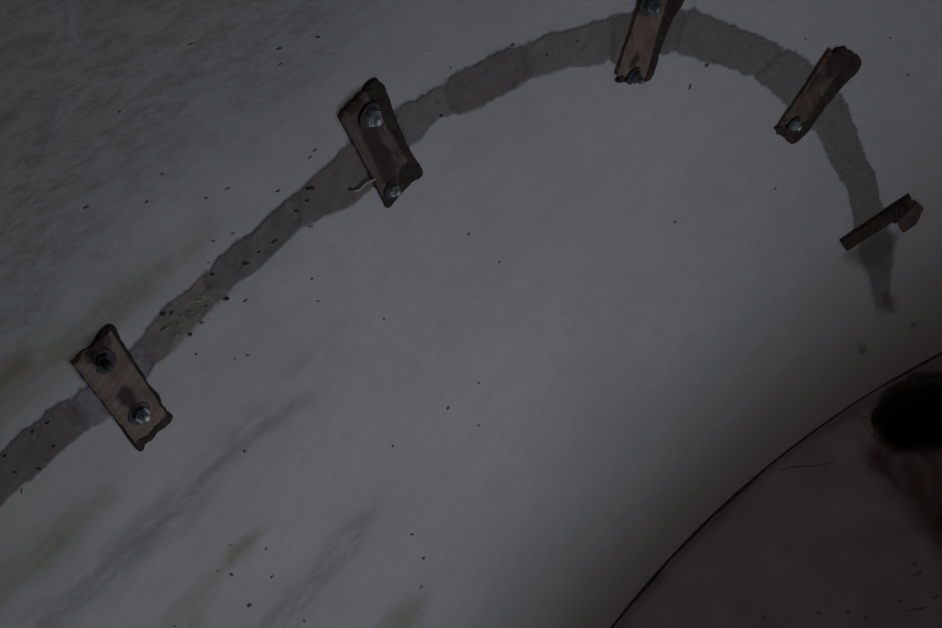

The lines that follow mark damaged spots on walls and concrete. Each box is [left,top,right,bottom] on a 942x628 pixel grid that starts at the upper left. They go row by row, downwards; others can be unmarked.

spalling [856,373,942,455]